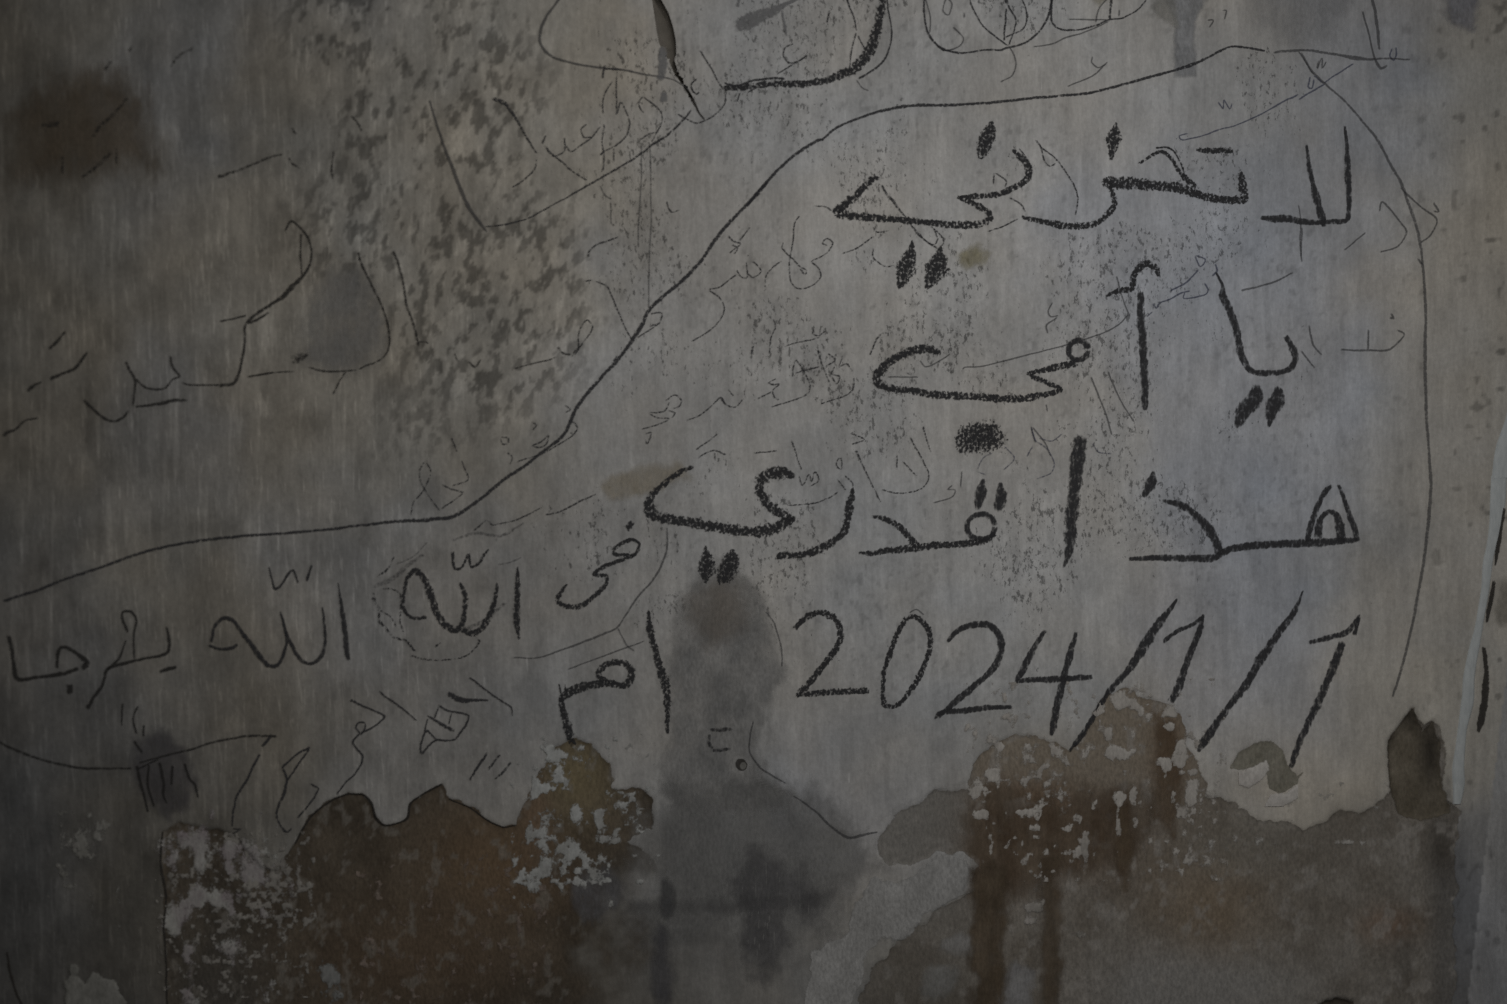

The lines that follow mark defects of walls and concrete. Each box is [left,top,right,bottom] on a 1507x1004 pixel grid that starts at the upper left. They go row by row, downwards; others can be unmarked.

crack [652,0,705,119]
flaking render [154,735,660,1004]
water stain [646,567,852,1004]
flaking render [858,681,1462,1004]